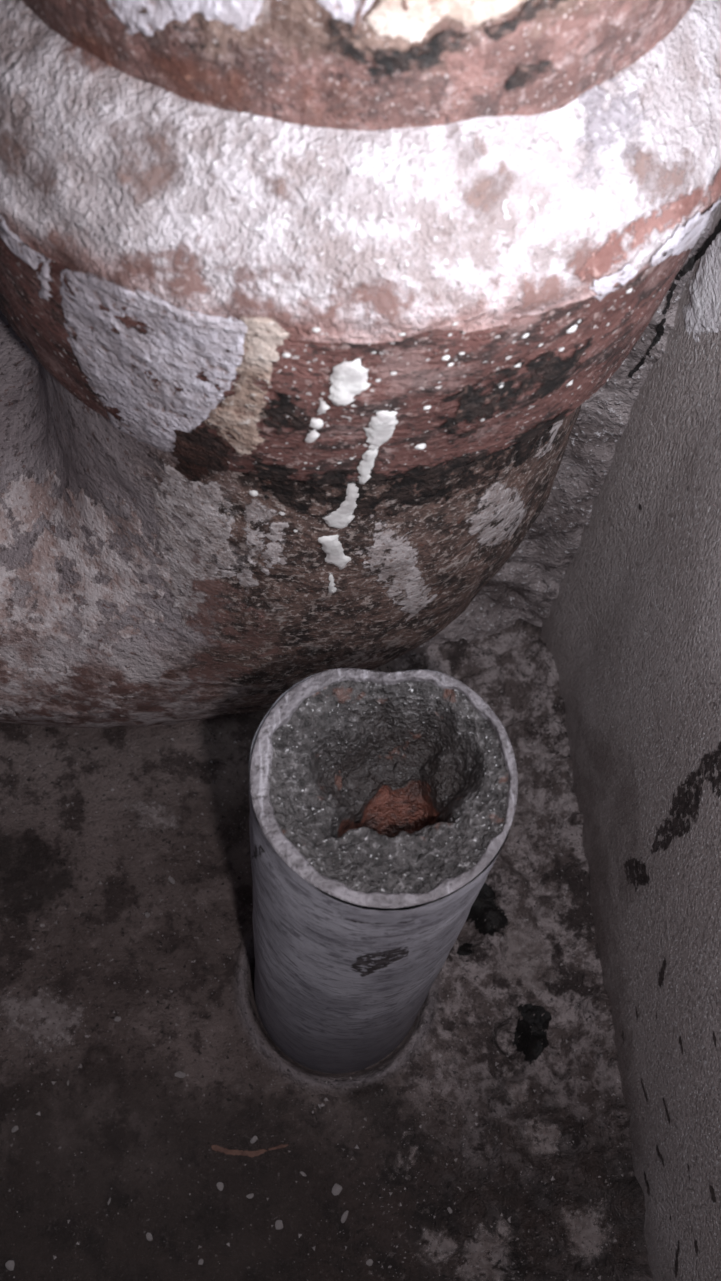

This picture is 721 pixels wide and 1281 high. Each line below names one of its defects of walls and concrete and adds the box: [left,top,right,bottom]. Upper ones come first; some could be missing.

peeling [106,0,263,36]
peeling [317,0,528,43]
spalling [575,75,654,179]
crack [628,219,721,378]
peeling [0,215,290,657]
peeling [534,420,563,459]
peeling [465,482,527,548]
peeling [355,514,438,622]
peeling [0,662,147,718]